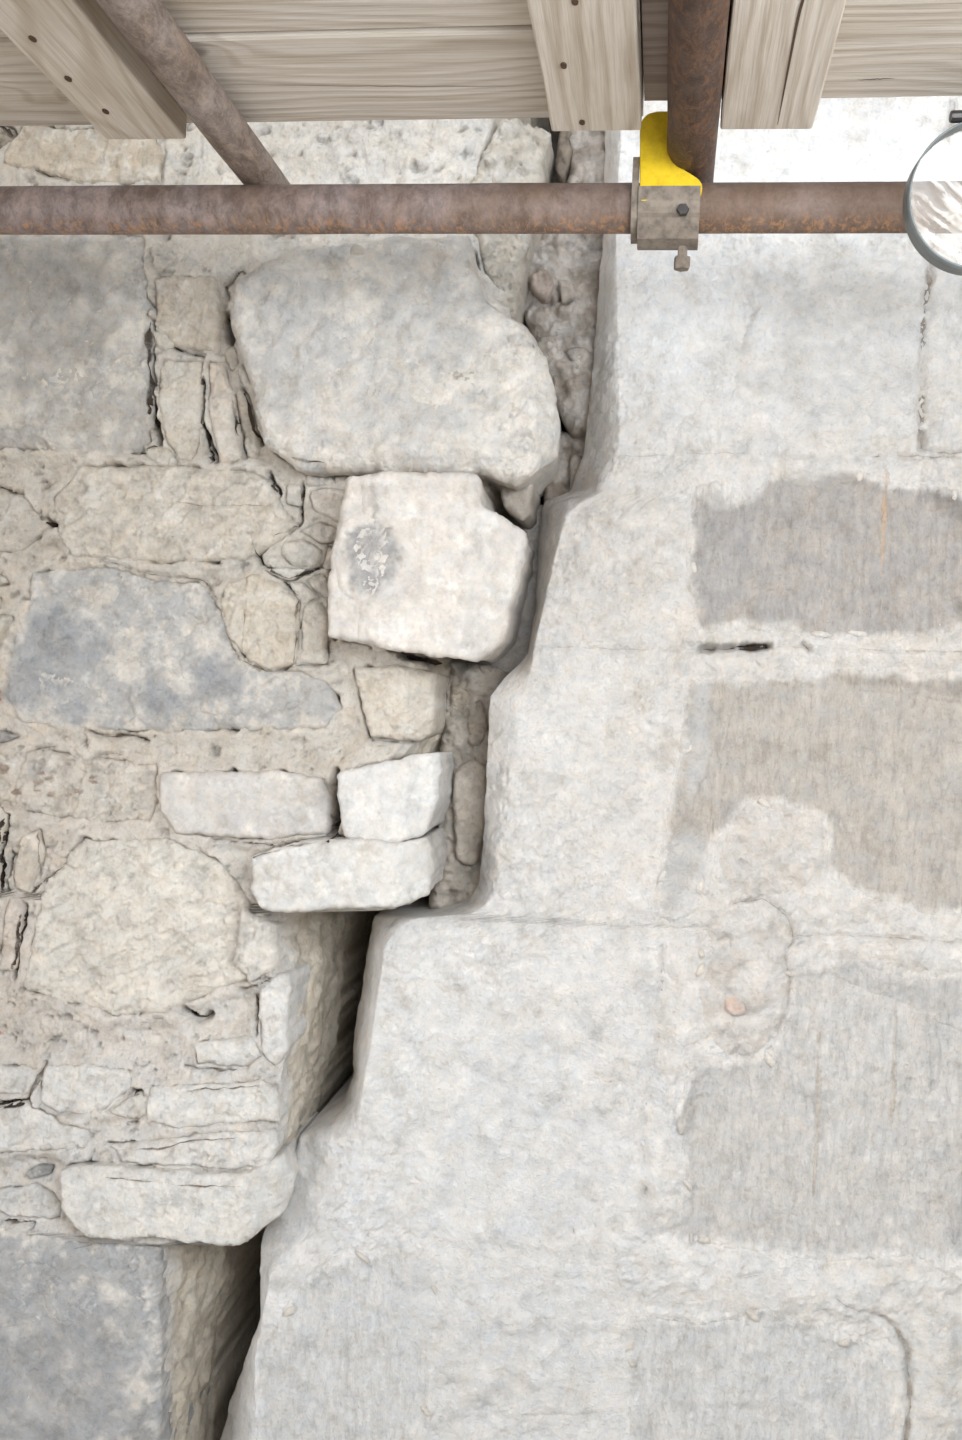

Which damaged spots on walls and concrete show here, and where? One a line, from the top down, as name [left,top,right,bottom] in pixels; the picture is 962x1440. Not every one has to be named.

crack [377,82,442,90]
crack [549,121,605,183]
crack [140,322,328,672]
leakage [916,484,962,525]
crack [369,234,603,909]
leakage [685,480,800,633]
crack [704,643,769,651]
leakage [843,670,962,703]
leakage [654,679,715,922]
crack [249,813,341,858]
crack [196,1068,257,1090]
crack [106,1138,234,1188]